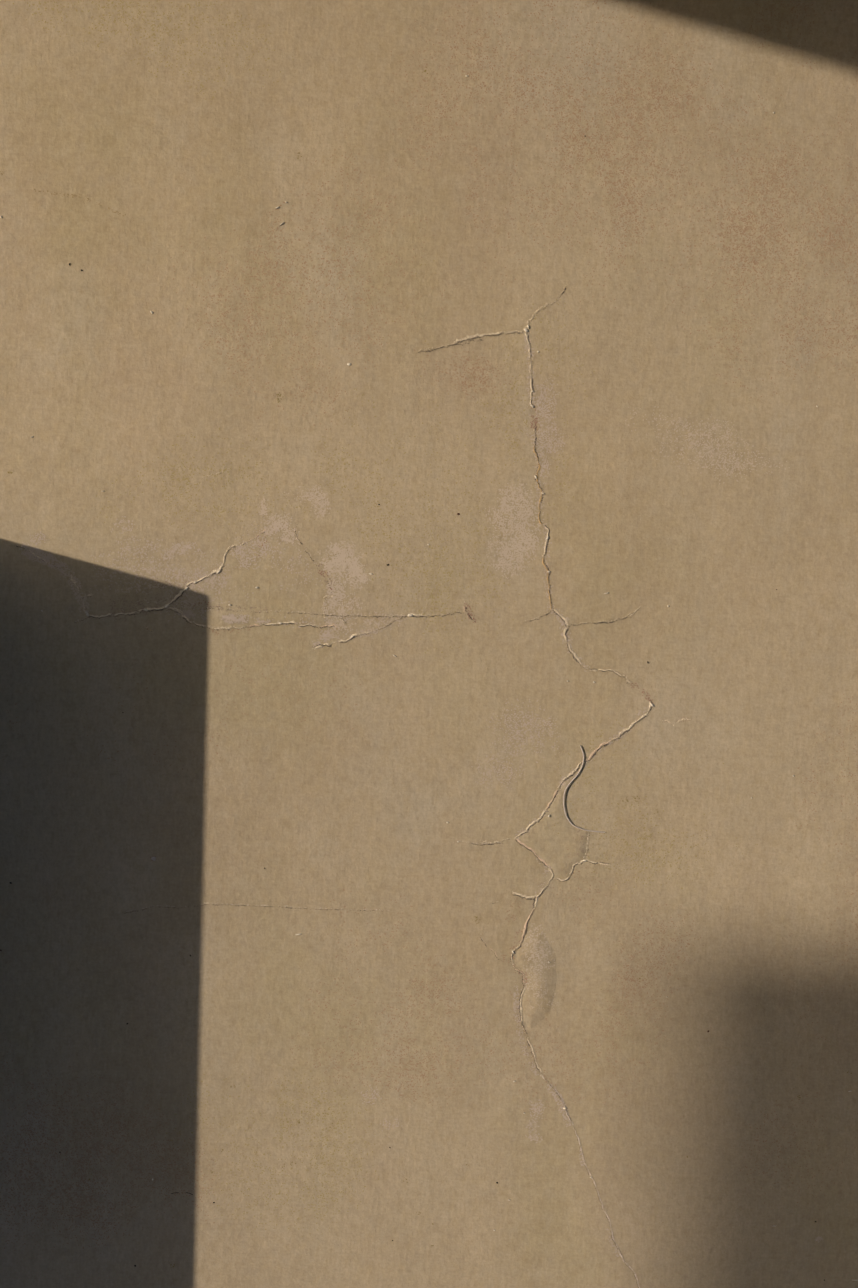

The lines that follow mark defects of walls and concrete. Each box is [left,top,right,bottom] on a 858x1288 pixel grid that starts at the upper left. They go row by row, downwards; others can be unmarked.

crack [16,528,476,650]
crack [418,287,690,1288]